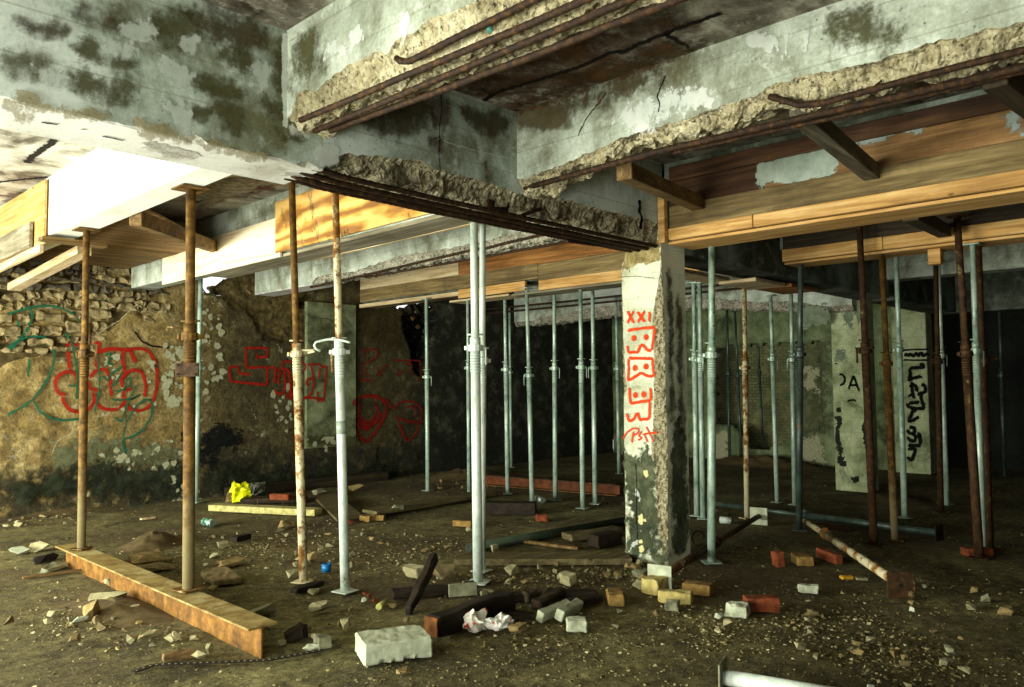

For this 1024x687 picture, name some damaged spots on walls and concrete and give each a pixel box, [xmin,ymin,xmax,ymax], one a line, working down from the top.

damp [0,3,138,107]
damp [152,2,340,167]
spalling [288,0,667,139]
crack [578,93,606,136]
crack [481,12,722,102]
damp [826,3,904,57]
flaking render [0,260,171,368]
spalling [196,22,1024,563]